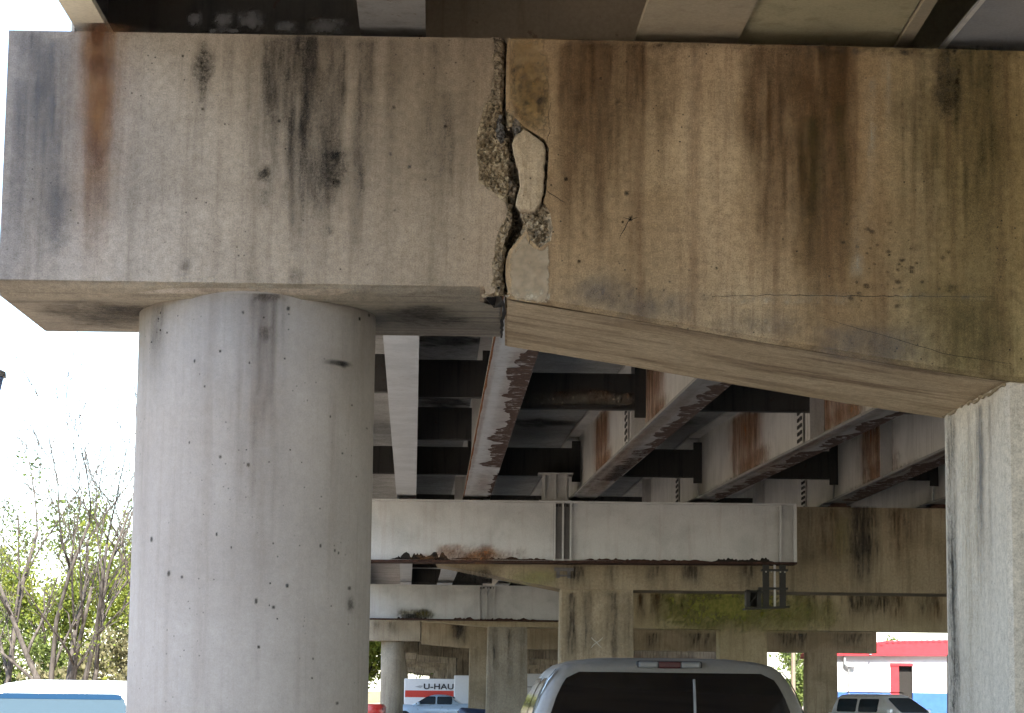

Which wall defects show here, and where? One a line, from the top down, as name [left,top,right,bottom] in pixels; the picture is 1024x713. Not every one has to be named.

water stain [263,39,316,155]
spalling [476,102,553,247]
crack [482,37,564,338]
water stain [752,47,857,209]
spalling [486,287,502,308]
crack [713,294,1011,364]
corrosion [392,547,546,563]